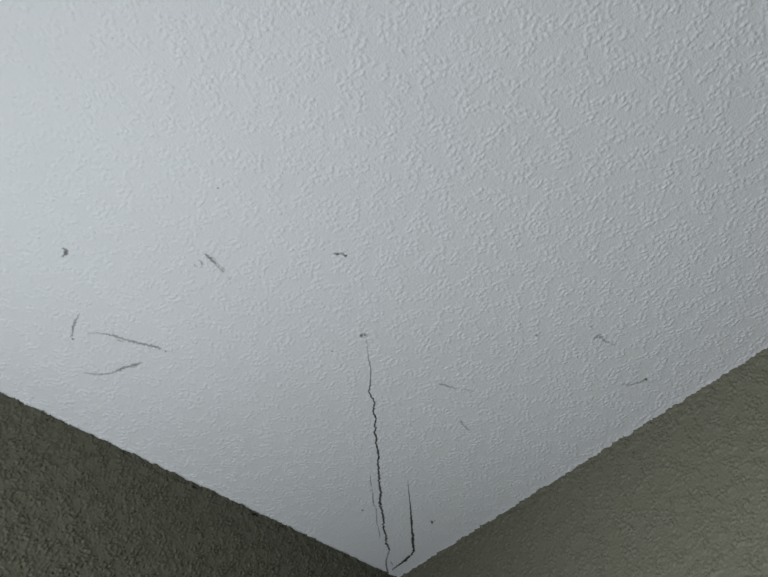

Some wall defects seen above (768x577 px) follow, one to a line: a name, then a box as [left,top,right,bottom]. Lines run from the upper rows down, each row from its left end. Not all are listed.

crack [368,373,415,573]